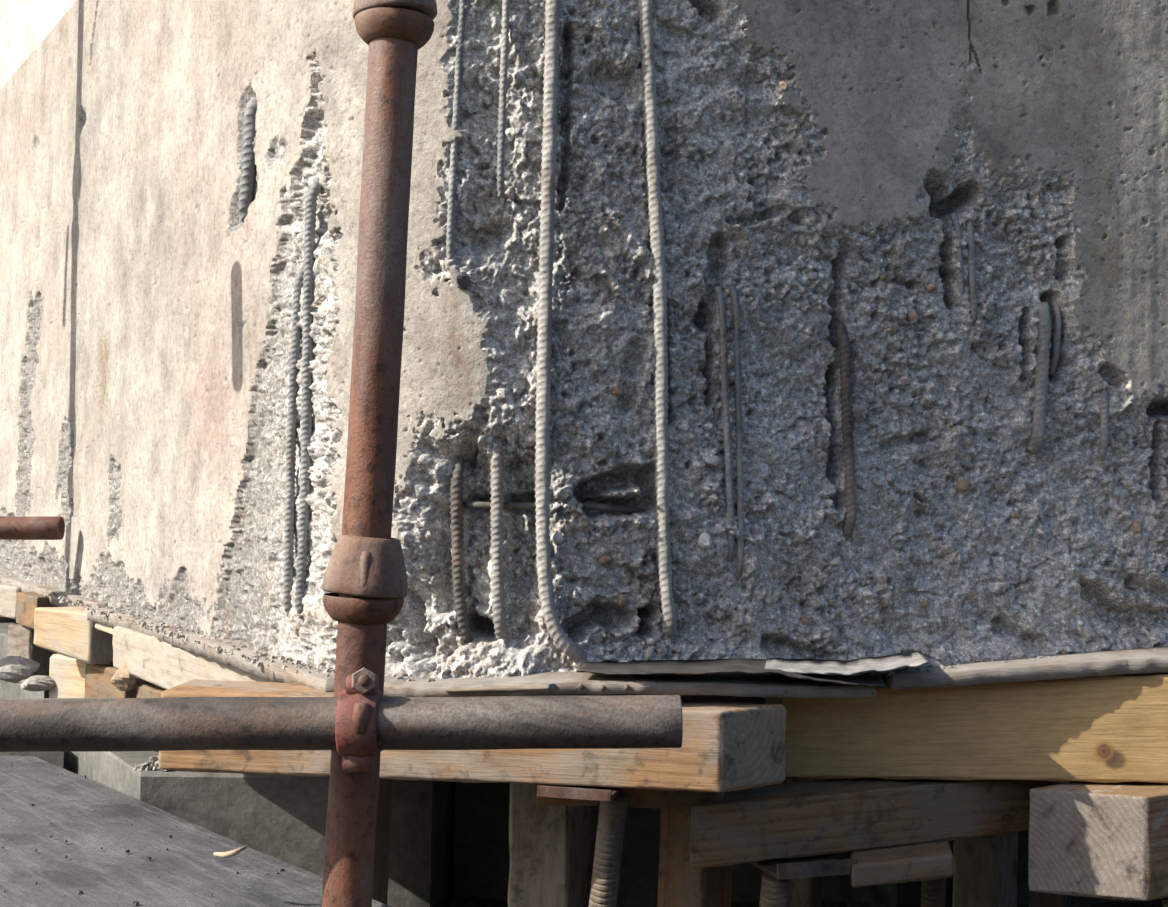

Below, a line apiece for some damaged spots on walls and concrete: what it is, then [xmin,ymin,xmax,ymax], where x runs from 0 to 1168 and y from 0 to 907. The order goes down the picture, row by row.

spalling [0,44,343,669]
spalling [385,0,1168,679]
crack [967,0,982,74]